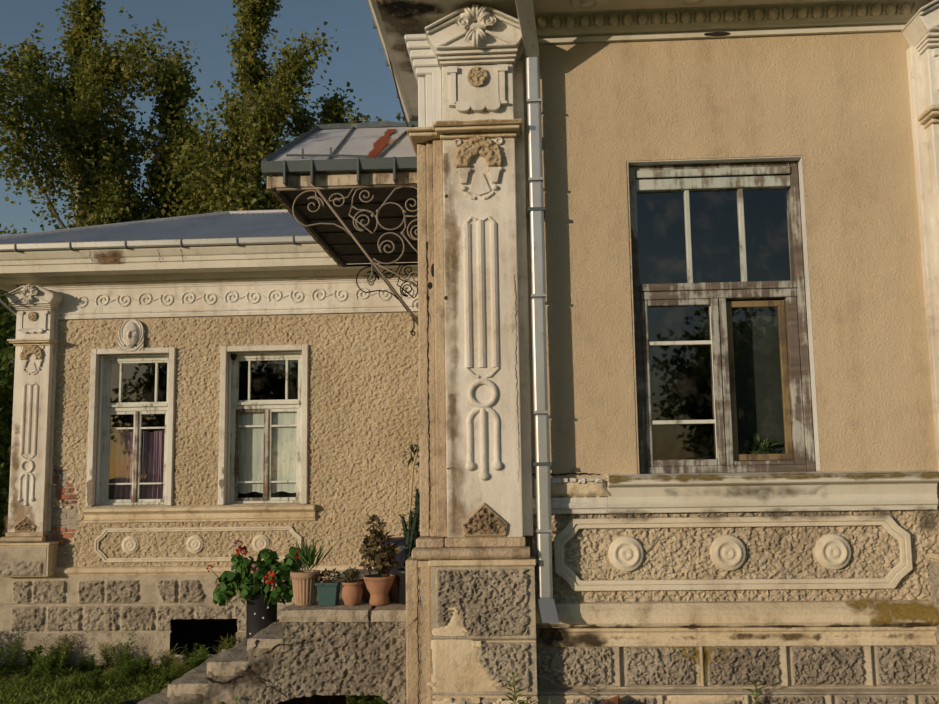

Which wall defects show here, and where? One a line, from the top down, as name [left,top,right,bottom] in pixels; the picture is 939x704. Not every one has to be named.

damp [377,0,442,72]
damp [444,211,459,317]
damp [448,395,458,440]
spalling [48,464,93,548]
damp [451,462,464,535]